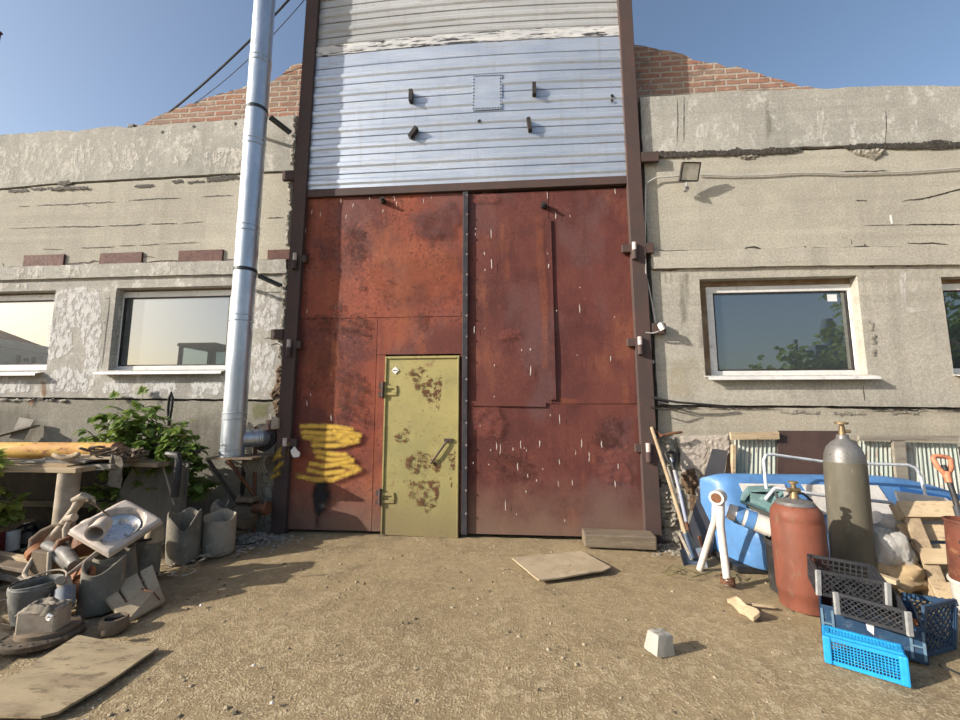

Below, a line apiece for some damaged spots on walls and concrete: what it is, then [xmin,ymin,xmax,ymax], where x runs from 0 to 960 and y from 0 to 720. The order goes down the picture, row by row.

crack [905,189,960,201]
crack [11,201,198,265]
crack [906,224,960,267]
peeling [0,268,131,403]
peeling [145,380,177,397]
peeling [191,380,223,396]
rust [406,367,442,411]
rust [402,451,456,512]